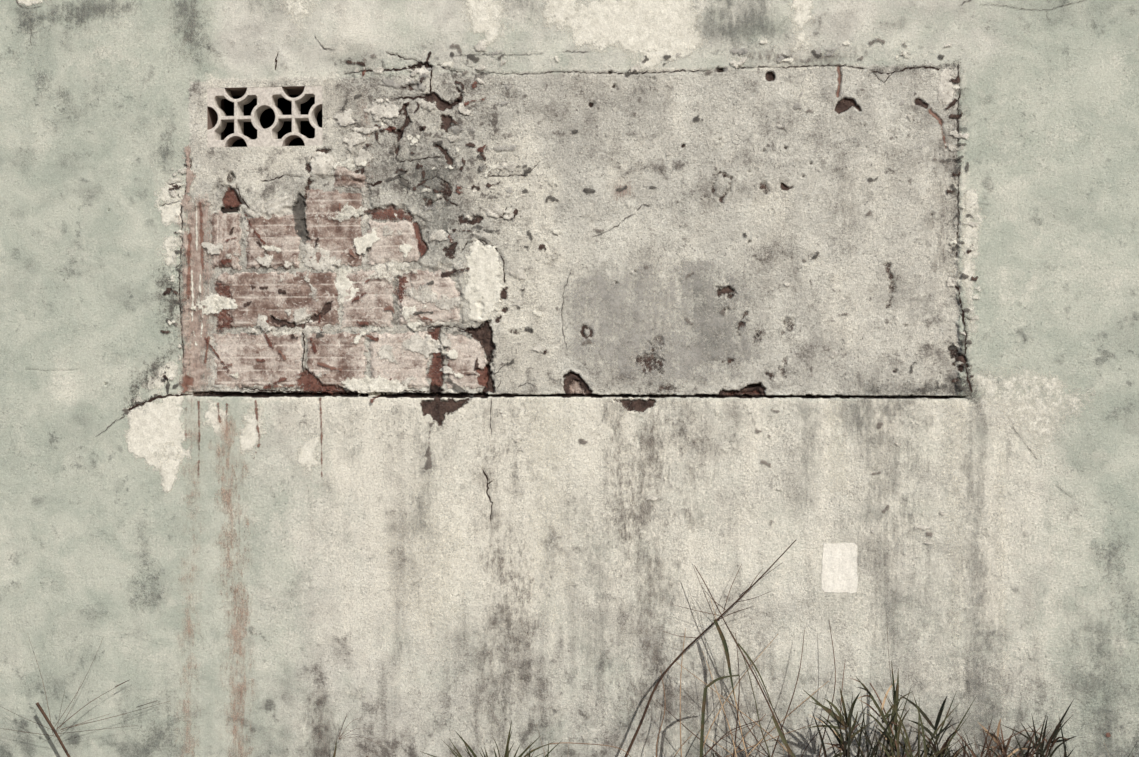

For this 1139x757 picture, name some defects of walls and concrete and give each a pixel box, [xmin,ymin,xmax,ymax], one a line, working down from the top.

peeling [542,0,703,88]
flaking render [705,39,768,74]
peeling [765,0,861,114]
flaking render [123,0,550,492]
crack [95,50,973,437]
flaking render [522,229,560,263]
flaking render [563,372,593,396]
flaking render [614,336,673,413]
flaking render [716,356,787,397]
water stain [424,421,434,470]
crack [482,469,493,521]